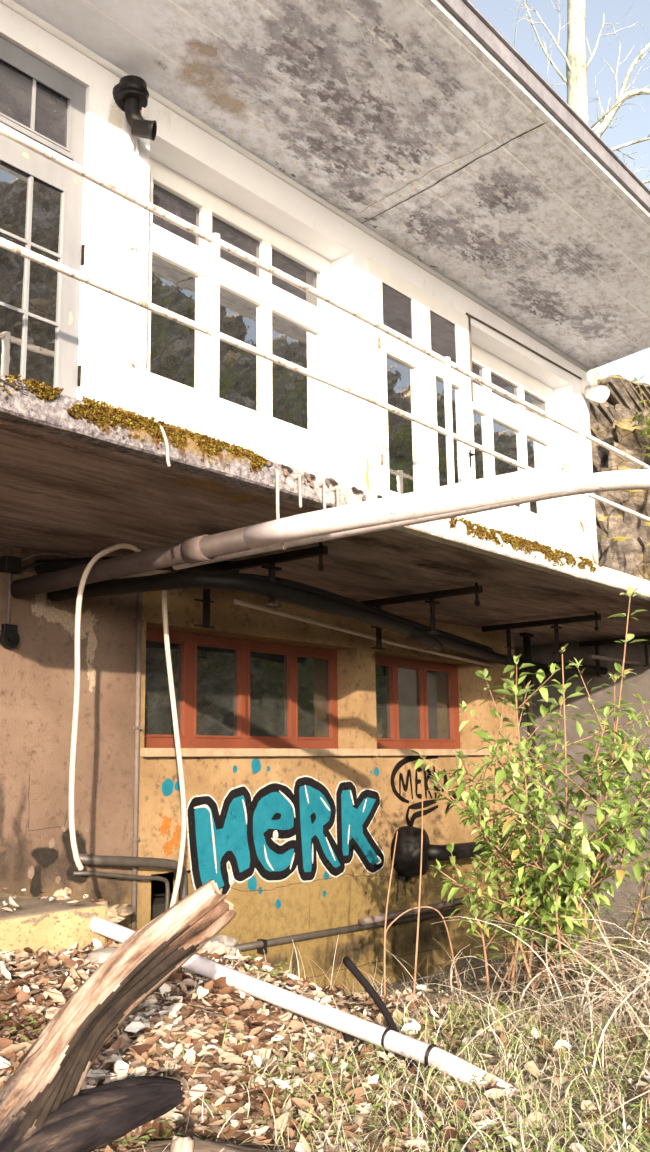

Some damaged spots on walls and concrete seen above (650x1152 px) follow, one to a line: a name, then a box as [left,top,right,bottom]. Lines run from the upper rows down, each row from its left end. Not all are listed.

leakage [184,0,469,228]
crack [359,113,547,223]
leakage [400,173,614,338]
flaking render [30,593,99,692]